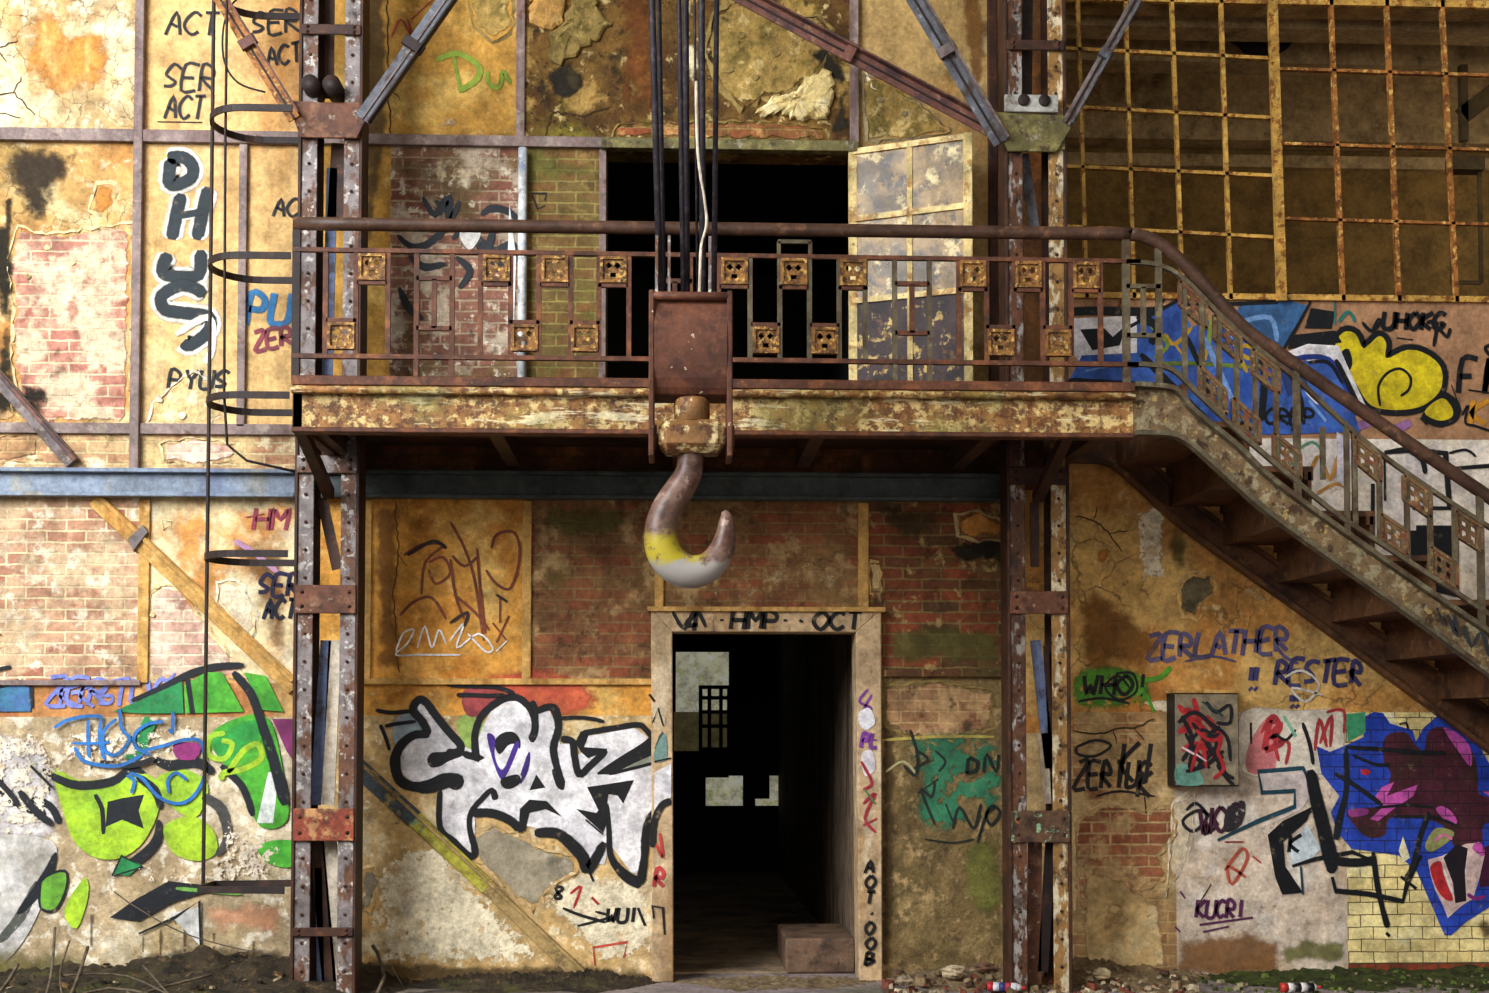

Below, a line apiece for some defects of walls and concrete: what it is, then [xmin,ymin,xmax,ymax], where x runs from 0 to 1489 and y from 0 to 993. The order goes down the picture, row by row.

crack [0,41,35,118]
water stain [549,65,582,97]
flaking render [611,0,835,140]
water stain [0,149,66,412]
flaking render [0,179,241,467]
crack [1075,507,1128,552]
flaking render [1073,787,1197,917]